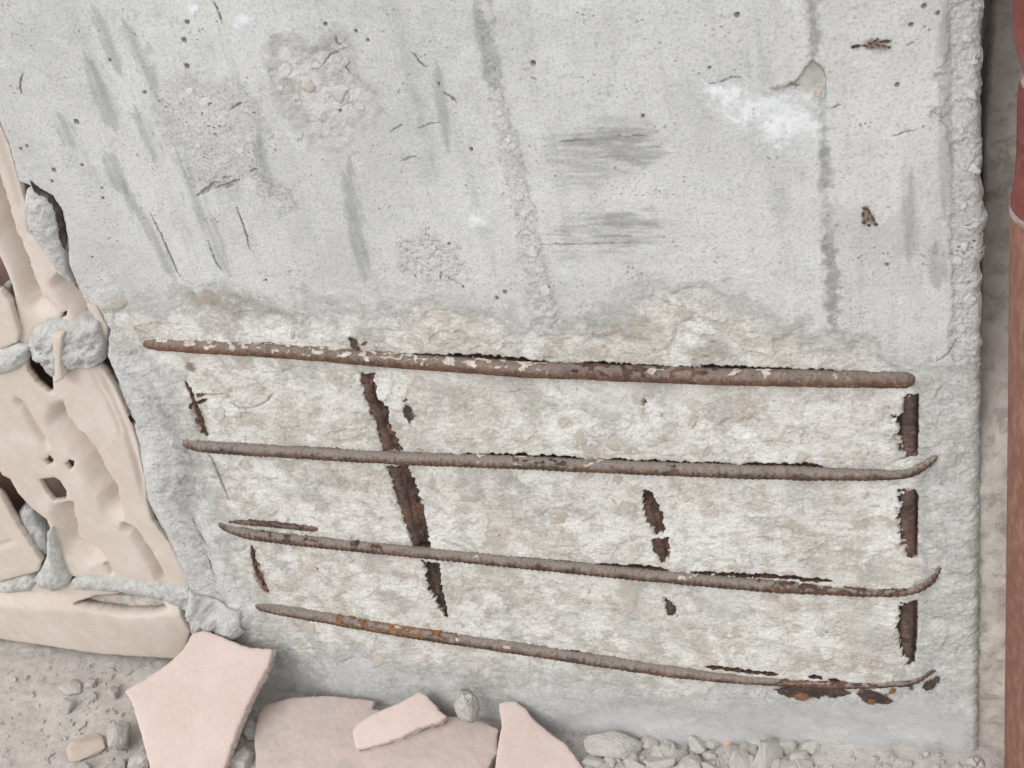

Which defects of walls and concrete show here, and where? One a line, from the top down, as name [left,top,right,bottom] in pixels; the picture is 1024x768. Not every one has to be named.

corrosion [851,38,891,50]
damp [701,78,822,150]
corrosion [862,206,878,227]
spalling [101,0,989,707]
corrosion [360,372,417,451]
corrosion [893,393,920,456]
corrosion [387,465,431,546]
corrosion [642,489,670,563]
corrosion [252,561,268,593]
corrosion [421,560,448,617]
corrosion [896,600,918,666]
corrosion [774,676,940,705]